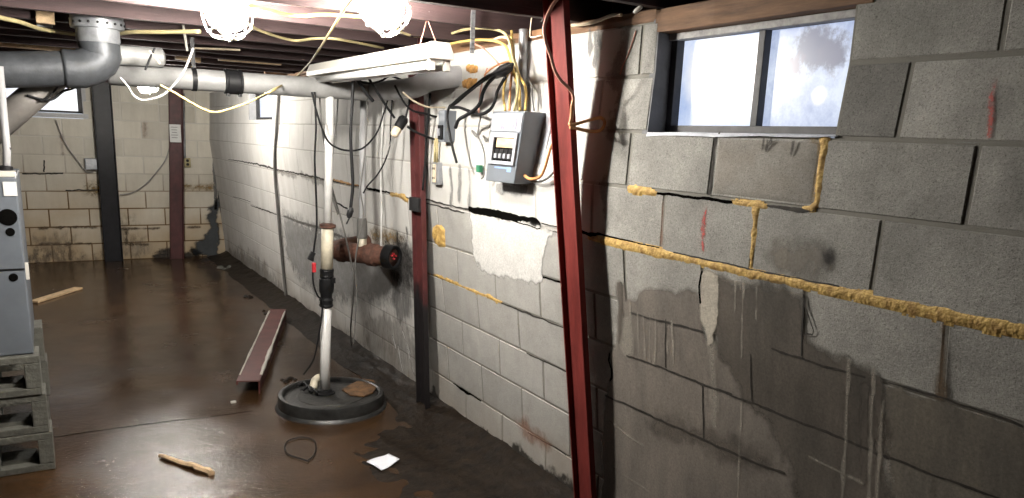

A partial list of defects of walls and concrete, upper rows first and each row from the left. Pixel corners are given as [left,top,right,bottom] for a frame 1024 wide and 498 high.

crack [228,159,557,233]
water stain [153,248,170,258]
water stain [372,227,408,247]
crack [582,131,1024,412]
water stain [601,276,1024,498]